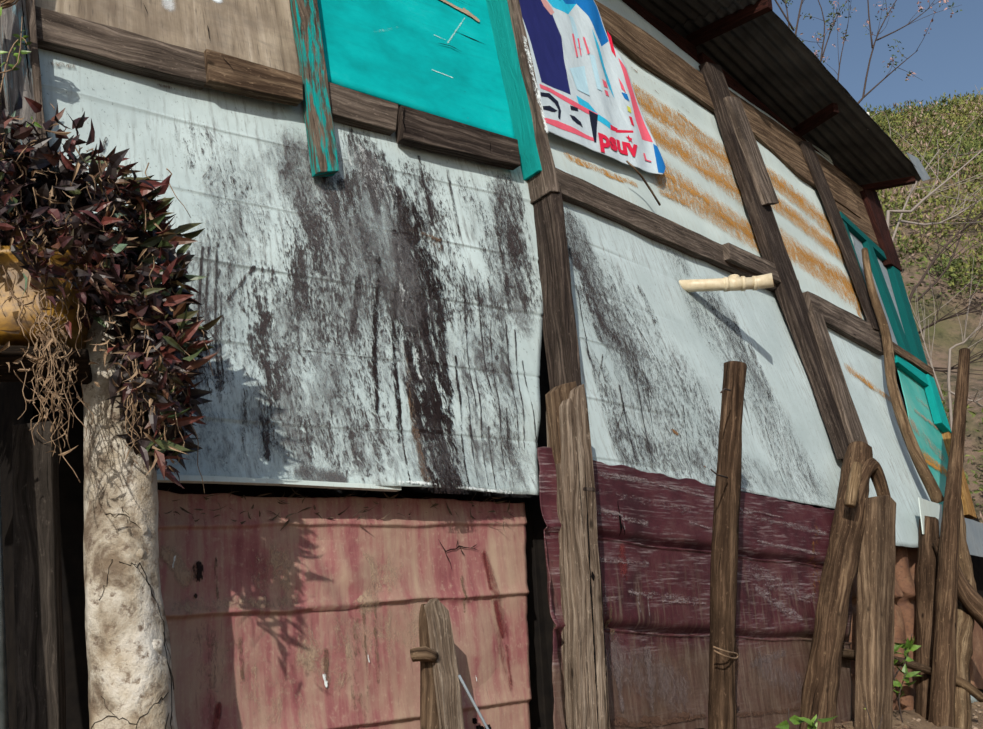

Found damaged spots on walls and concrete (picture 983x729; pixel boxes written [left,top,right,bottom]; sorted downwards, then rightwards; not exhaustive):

leakage [179,126,542,494]
leakage [564,208,720,473]
peeling [598,471,707,497]
corrosion [632,69,761,254]
leakage [687,292,820,494]
corrosion [766,166,864,318]
peeling [606,640,687,711]
peeling [749,568,814,621]